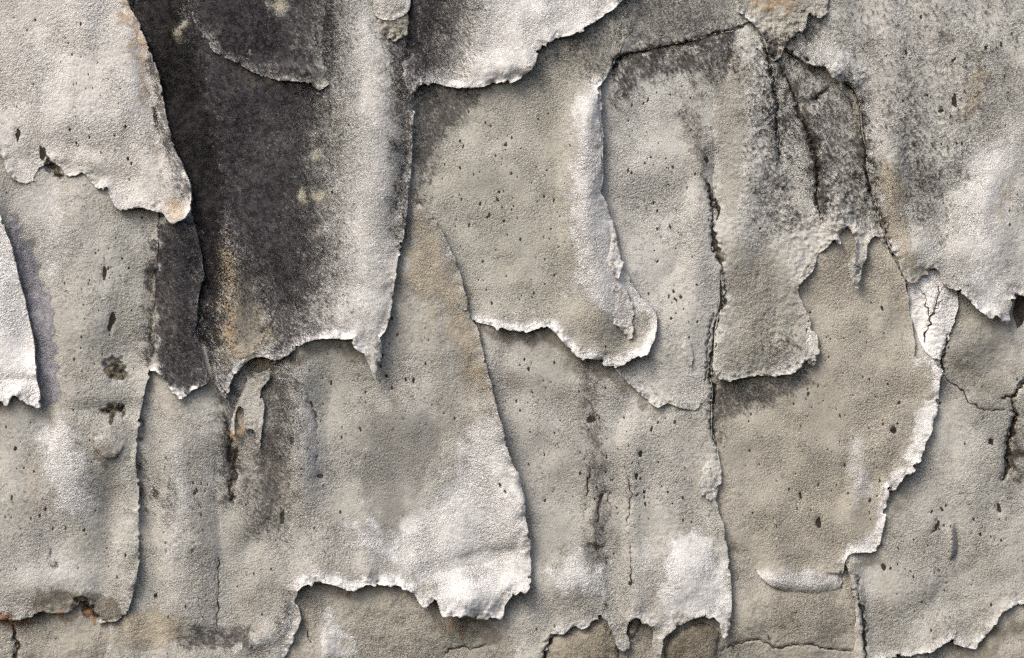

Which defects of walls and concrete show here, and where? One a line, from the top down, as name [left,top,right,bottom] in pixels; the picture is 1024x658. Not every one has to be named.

peeling [171,0,223,81]
crack [766,53,893,253]
peeling [178,268,227,326]
damp [119,0,1024,556]
crack [706,182,727,442]
crack [922,284,1024,480]
damp [340,359,613,627]
damp [757,569,842,592]